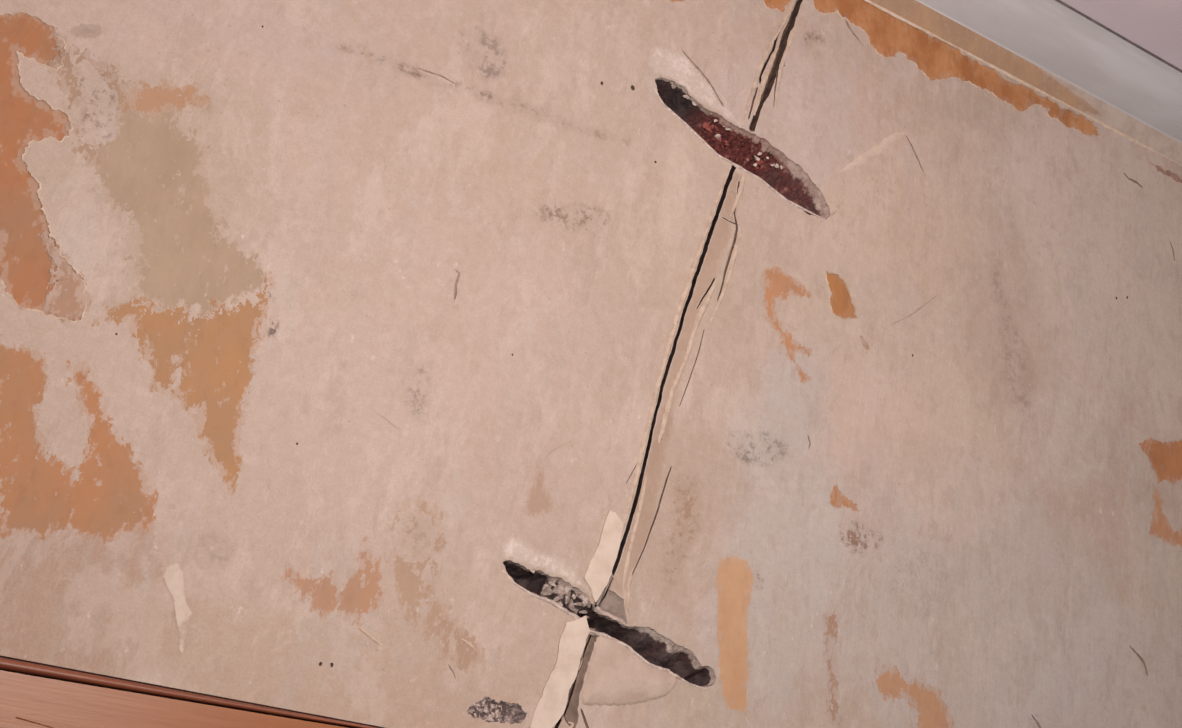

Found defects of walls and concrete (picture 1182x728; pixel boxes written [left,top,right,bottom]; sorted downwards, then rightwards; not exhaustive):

crack [742,0,803,131]
peeling [762,0,790,13]
peeling [813,0,1102,139]
peeling [0,10,283,499]
peeling [760,266,813,386]
peeling [825,270,858,320]
peeling [0,332,159,545]
crack [528,162,745,728]
peeling [1138,437,1182,547]
spalling [542,581,589,619]
peeling [714,554,755,714]
peeling [871,662,954,728]